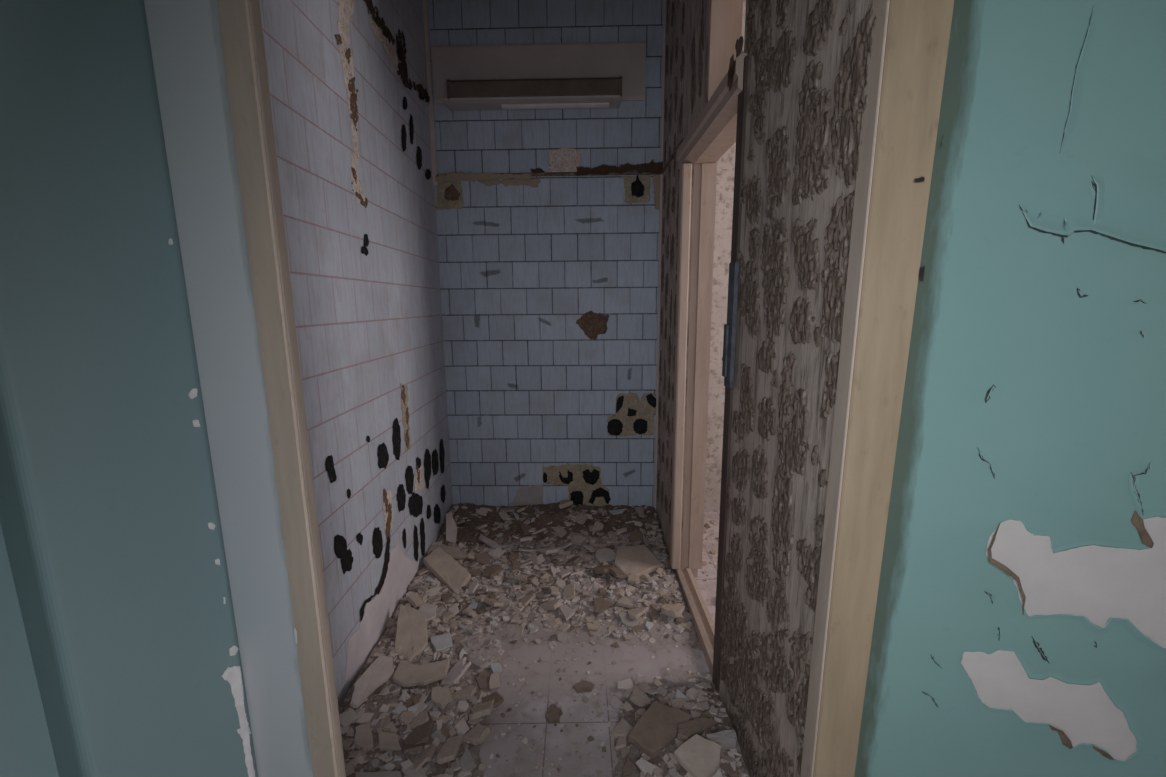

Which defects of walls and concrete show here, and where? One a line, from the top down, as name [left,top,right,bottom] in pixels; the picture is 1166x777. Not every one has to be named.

spalling [364,0,430,103]
peeling [436,181,464,210]
peeling [623,175,651,204]
spalling [576,311,609,340]
spalling [400,383,411,452]
peeling [607,393,656,436]
spalling [415,465,425,492]
peeling [509,463,611,507]
spalling [345,488,424,682]
peeling [985,510,1166,655]
peeling [222,645,255,777]
peeling [960,647,1144,766]